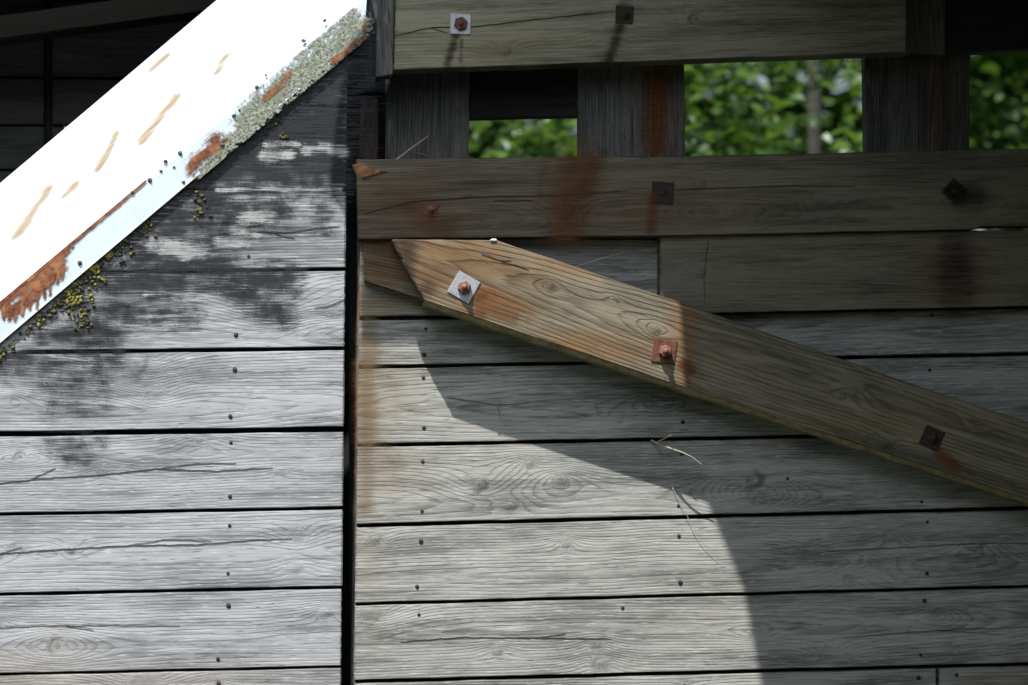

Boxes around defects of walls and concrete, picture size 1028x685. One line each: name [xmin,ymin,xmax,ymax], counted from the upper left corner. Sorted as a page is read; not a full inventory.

rust [330,19,366,64]
rust [261,71,292,102]
rust [185,131,227,177]
water stain [0,10,397,416]
rust [0,180,147,322]
water stain [38,430,107,467]
crack [4,463,272,483]
crack [1,538,292,554]